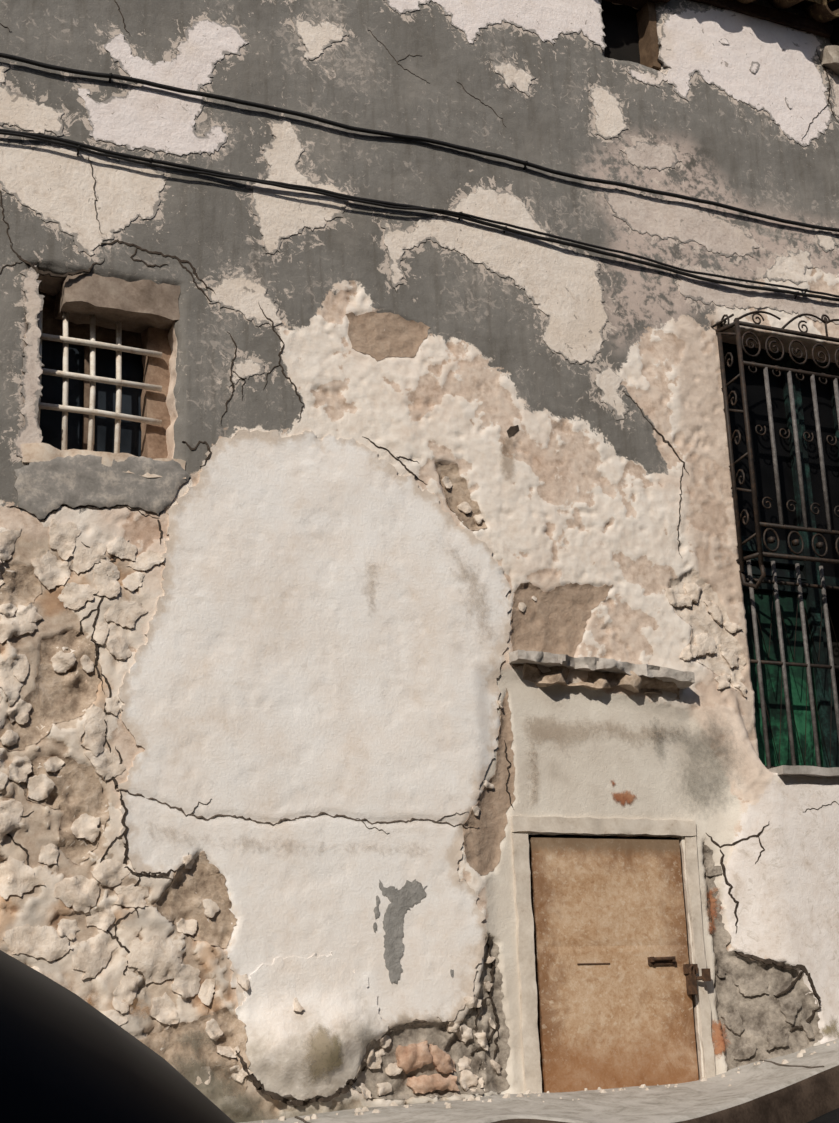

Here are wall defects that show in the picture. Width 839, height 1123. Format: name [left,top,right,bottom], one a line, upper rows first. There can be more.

peeling [0,19,249,256]
peeling [386,0,607,52]
peeling [625,8,839,147]
crack [0,156,215,302]
crack [182,302,304,467]
peeling [380,186,629,420]
crack [6,504,163,544]
spalling [0,529,250,1096]
crack [78,541,480,976]
rust [611,780,637,806]
crack [706,823,821,1031]
spalling [352,932,510,1100]